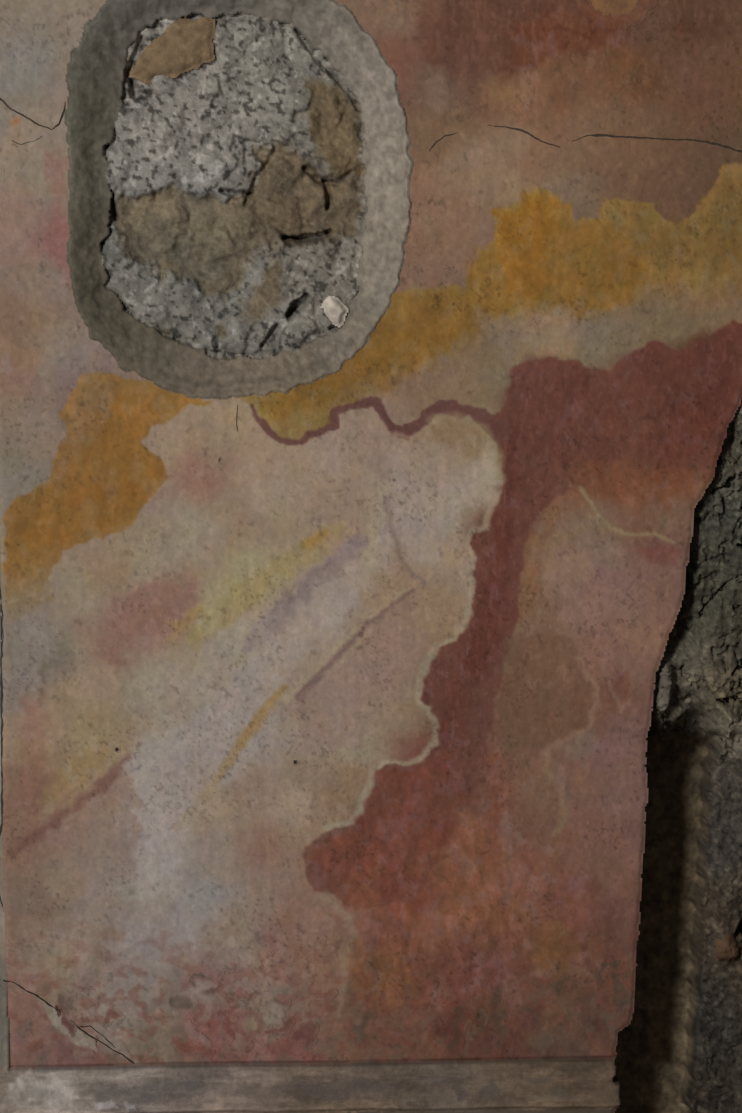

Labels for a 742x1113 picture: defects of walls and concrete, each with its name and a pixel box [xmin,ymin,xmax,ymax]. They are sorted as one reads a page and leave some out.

crack [0,98,66,145]
crack [489,125,742,152]
spalling [65,0,414,400]
flaking render [615,397,742,1113]
crack [3,979,134,1064]